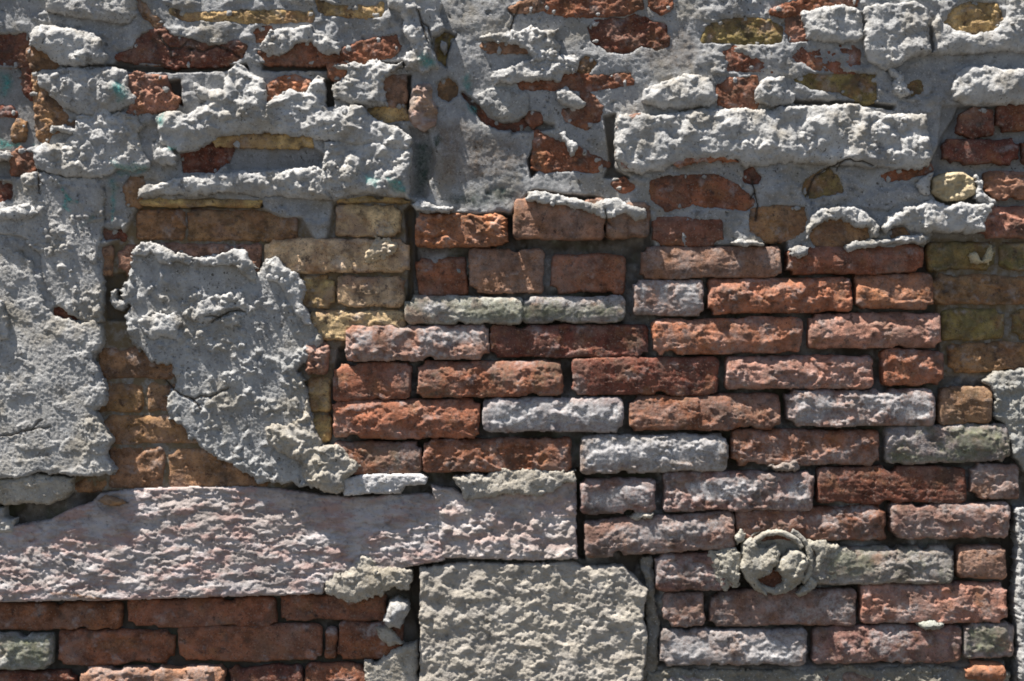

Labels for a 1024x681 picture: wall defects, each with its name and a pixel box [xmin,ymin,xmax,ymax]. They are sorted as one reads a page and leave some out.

crack [807,158,874,198]
flaking render [0,0,1024,533]
crack [166,380,224,409]